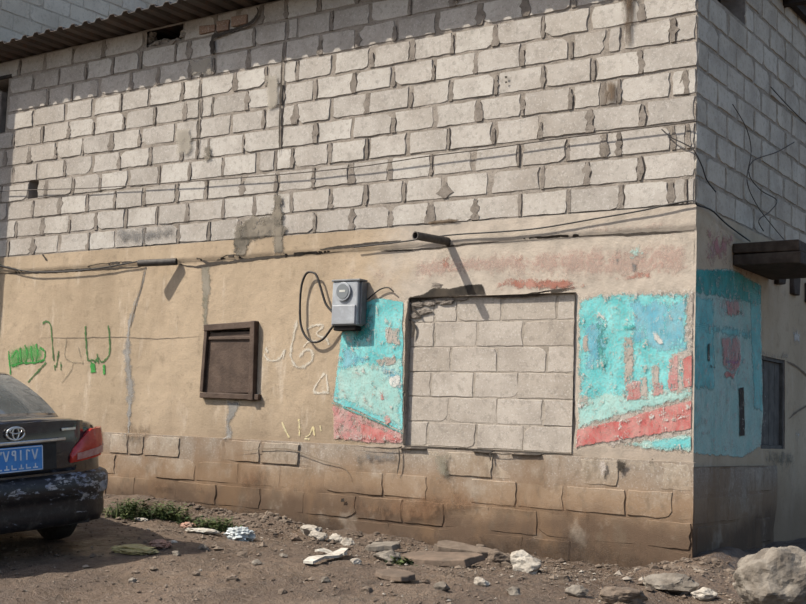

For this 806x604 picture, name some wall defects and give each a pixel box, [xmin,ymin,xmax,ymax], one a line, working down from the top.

damp [625,0,633,34]
spalling [408,282,485,319]